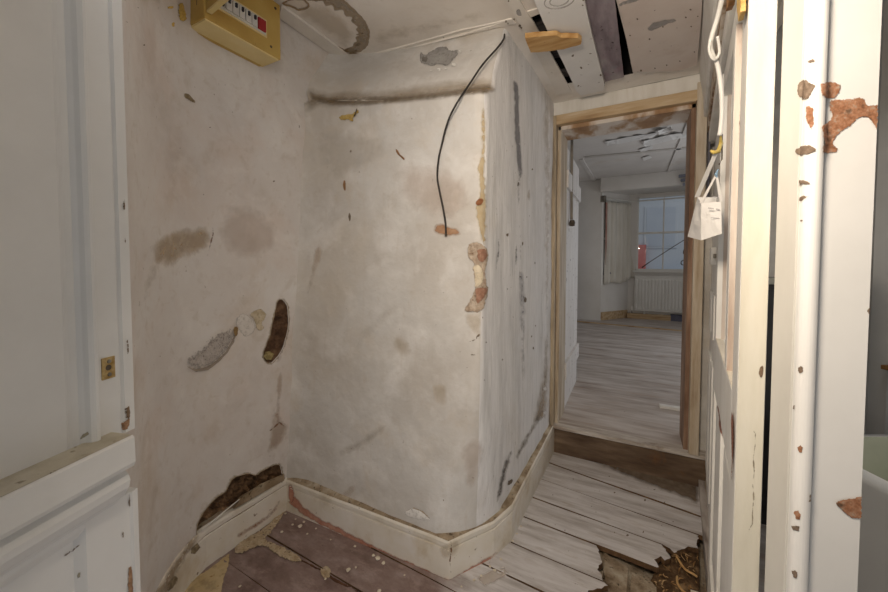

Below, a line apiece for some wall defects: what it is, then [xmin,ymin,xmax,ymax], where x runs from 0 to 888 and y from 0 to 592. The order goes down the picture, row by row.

water stain [282,0,370,54]
flaking render [420,47,462,72]
peeling [795,80,878,156]
flaking render [465,116,488,313]
flaking render [251,299,290,364]
peeling [717,405,734,479]
spalling [191,464,285,554]
peeling [836,497,862,519]